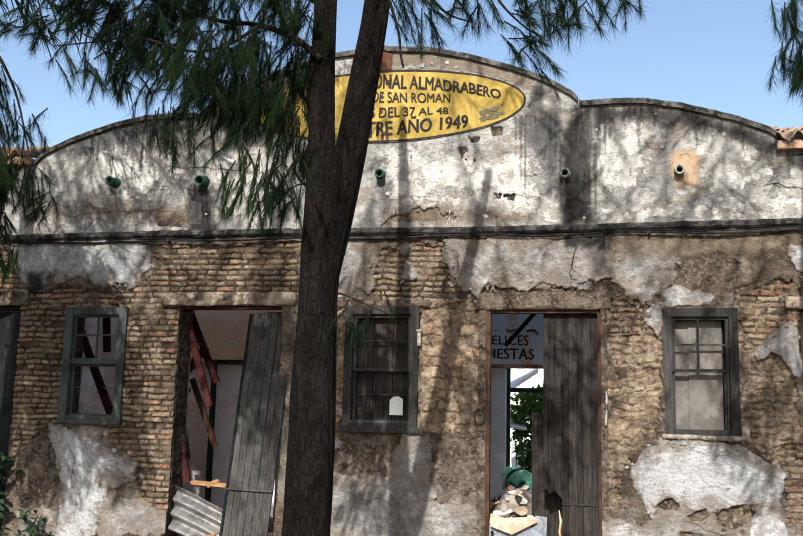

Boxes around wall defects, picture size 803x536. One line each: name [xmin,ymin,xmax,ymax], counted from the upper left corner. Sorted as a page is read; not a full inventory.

flaking render [51,146,191,205]
water stain [71,118,194,165]
flaking render [156,213,187,227]
water stain [376,181,392,200]
flaking render [382,136,565,225]
water stain [385,52,776,225]
flaking render [589,113,674,197]
flaking render [583,129,803,224]
water stain [786,150,803,169]
flaking render [0,240,301,536]
flaking render [330,235,803,536]